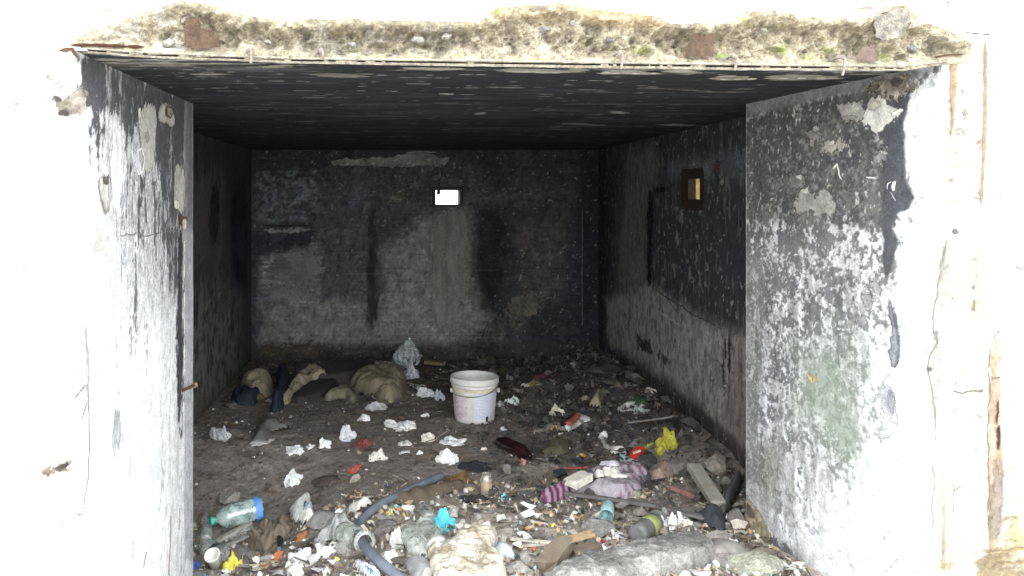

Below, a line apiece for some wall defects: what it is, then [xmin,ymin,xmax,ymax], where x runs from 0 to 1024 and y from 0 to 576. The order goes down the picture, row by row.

corrosion [59,43,144,59]
peeling [99,101,175,220]
corrosion [183,16,220,49]
peeling [330,151,449,169]
spalling [44,0,972,133]
corrosion [684,34,716,57]
peeling [789,171,837,221]
corrosion [932,54,964,188]
water stain [367,210,378,328]
water stain [429,207,471,335]
spalling [40,458,74,479]
corrosion [986,331,1017,555]